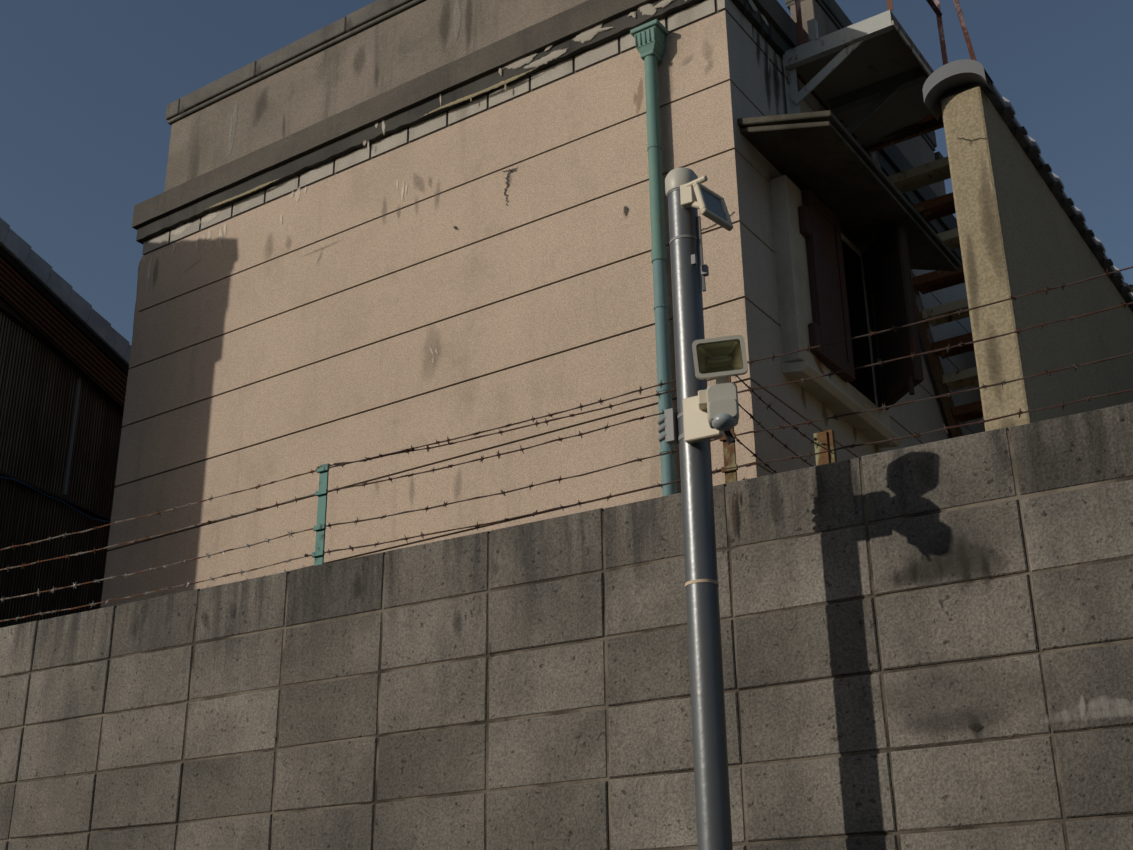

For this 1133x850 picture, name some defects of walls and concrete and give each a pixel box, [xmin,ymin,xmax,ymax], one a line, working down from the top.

peeling [628,0,687,18]
peeling [423,23,613,116]
damp [757,34,779,111]
crack [503,168,517,206]